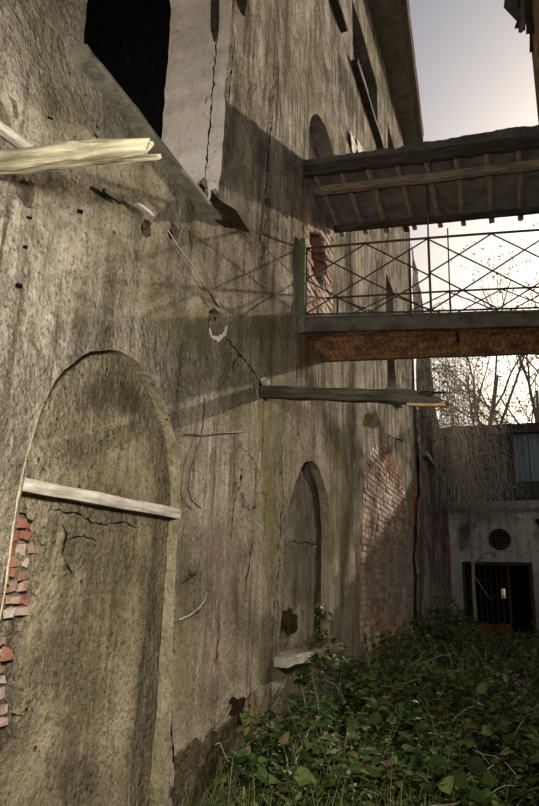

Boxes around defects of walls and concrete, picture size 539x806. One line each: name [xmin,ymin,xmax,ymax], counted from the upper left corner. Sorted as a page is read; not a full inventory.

crack [204,23,235,182]
spalling [139,213,154,242]
spalling [165,212,196,257]
spalling [303,217,334,316]
spalling [208,308,227,342]
spalling [0,406,47,757]
crack [47,508,143,585]
crack [227,403,319,655]
spalling [280,604,298,640]
spalling [357,406,418,656]
spalling [163,681,263,806]